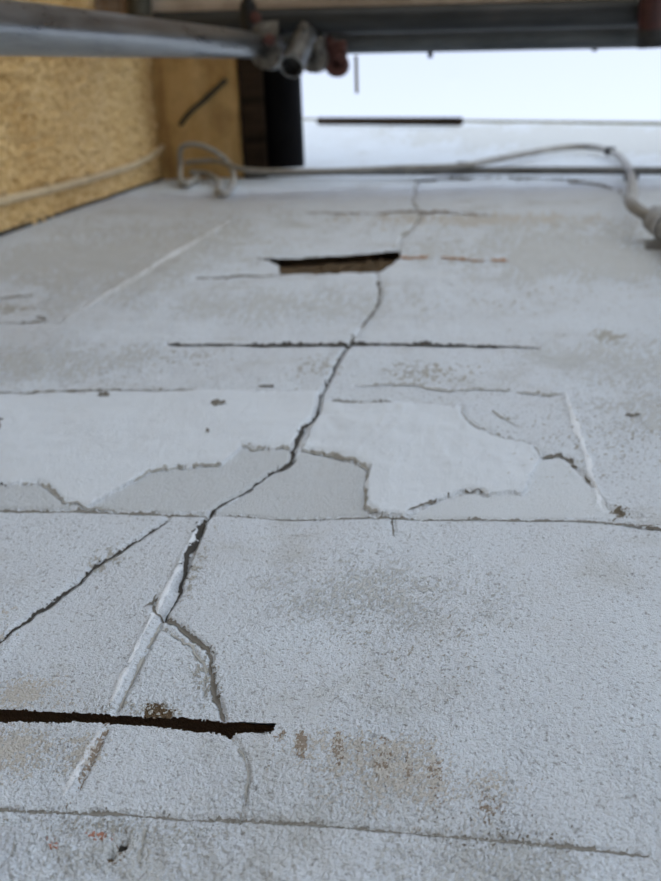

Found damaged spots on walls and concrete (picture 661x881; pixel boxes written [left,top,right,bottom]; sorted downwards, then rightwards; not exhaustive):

crack [312,175,626,262]
spalling [259,249,401,278]
crack [363,381,561,397]
peeling [24,443,378,521]
peeling [408,406,661,530]
crack [0,520,168,643]
crack [116,281,382,823]
rust [0,666,83,712]
rust [0,722,115,785]